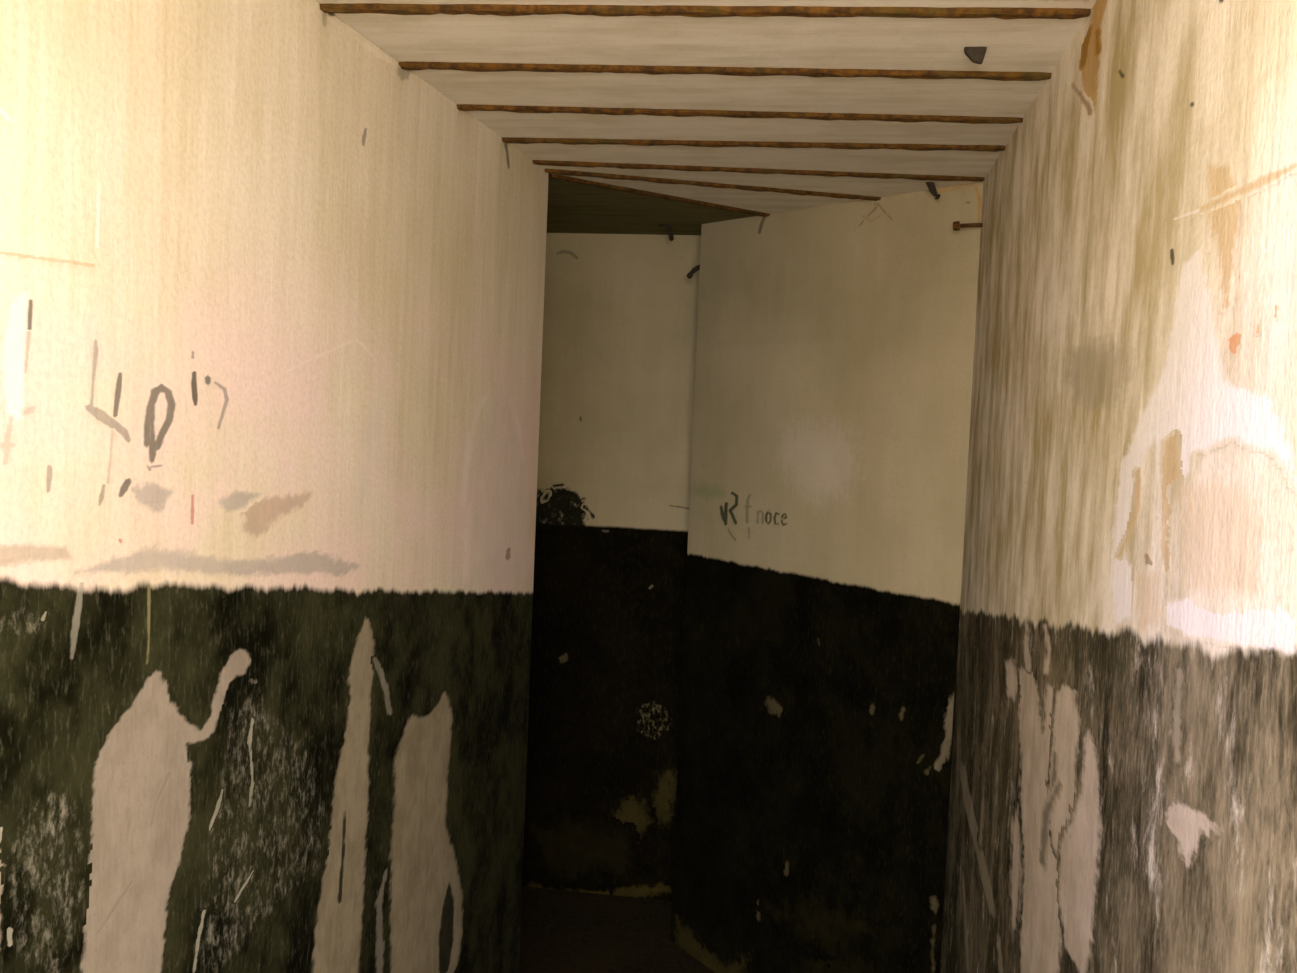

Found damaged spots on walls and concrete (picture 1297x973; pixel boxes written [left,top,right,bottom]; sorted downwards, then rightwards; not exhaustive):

flaking render [1168,247,1176,267]
leakage [1055,156,1297,661]
peeling [0,602,53,638]
peeling [1170,663,1187,768]
peeling [0,614,466,973]
peeling [914,614,1107,973]
peeling [1163,795,1222,876]